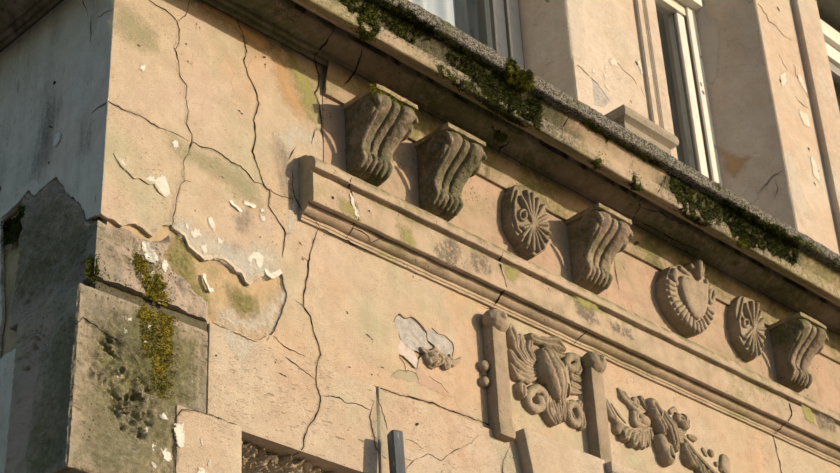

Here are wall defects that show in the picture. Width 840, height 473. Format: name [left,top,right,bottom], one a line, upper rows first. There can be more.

flaking render [113,150,171,198]
peeling [808,147,821,186]
flaking render [0,162,282,332]
water stain [167,234,210,308]
crack [93,0,489,459]
crack [68,317,150,385]
flaking render [393,315,453,369]
peeling [160,413,186,448]
crack [169,393,236,471]
crack [406,439,473,469]
crack [772,396,792,473]